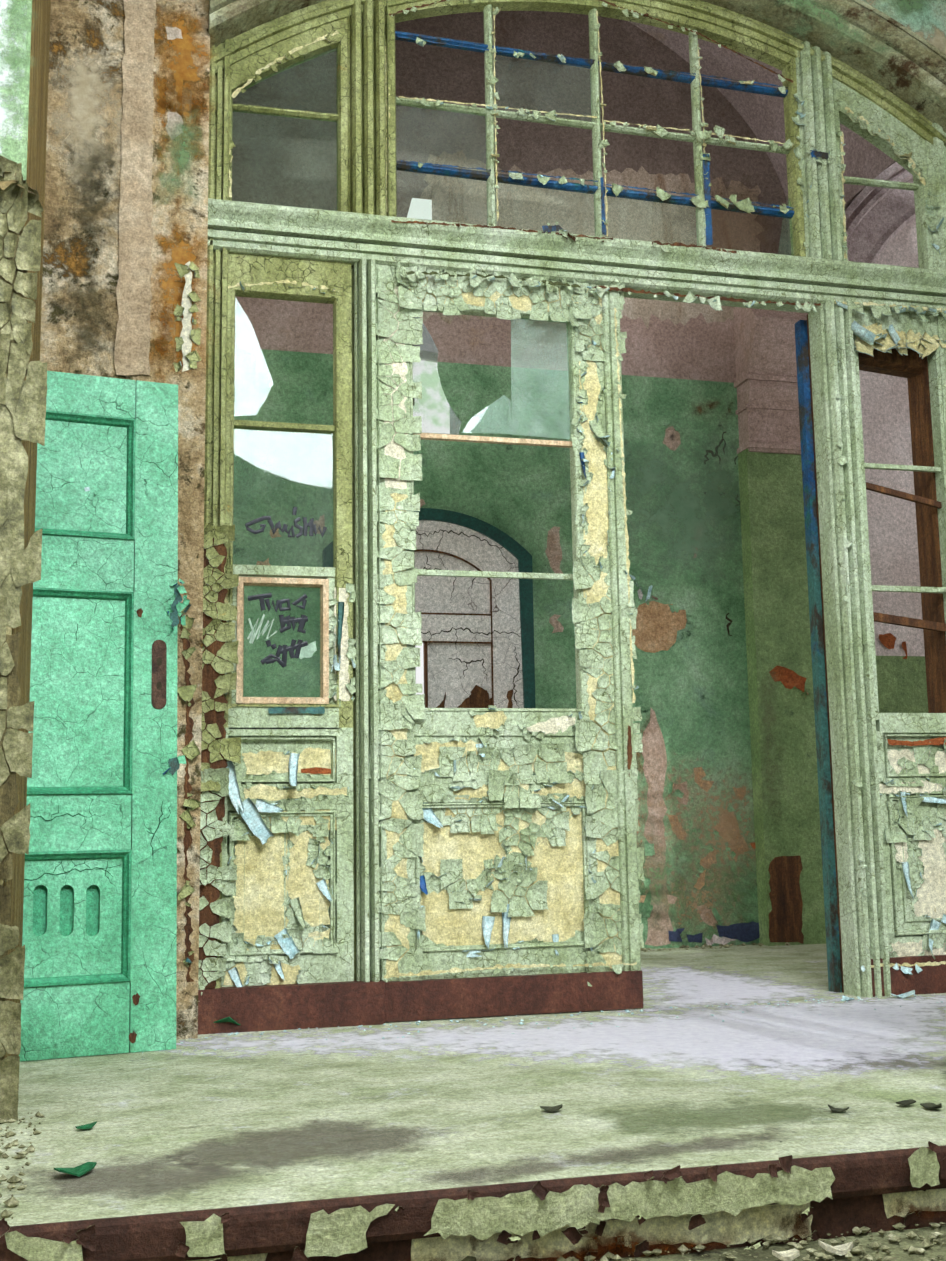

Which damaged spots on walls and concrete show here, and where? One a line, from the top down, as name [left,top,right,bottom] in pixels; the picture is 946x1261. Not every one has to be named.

water stain [54,53,122,242]
rust [154,13,210,177]
water stain [62,277,112,353]
rust [151,228,202,379]
crack [414,525,521,708]
peeling [368,257,946,986]
peeling [162,523,356,996]
peeling [0,1217,96,1261]
peeling [291,1204,404,1261]
peeling [411,1155,835,1261]
rust [530,1231,723,1261]
peeling [882,1141,946,1226]